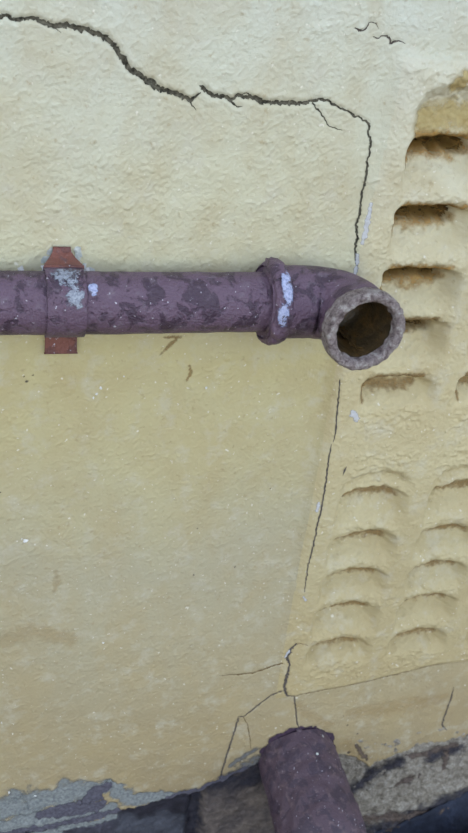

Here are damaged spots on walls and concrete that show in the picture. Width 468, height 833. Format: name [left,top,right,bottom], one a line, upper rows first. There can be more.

crack [355,22,406,44]
crack [0,13,372,275]
crack [304,379,347,592]
crack [219,643,439,779]
crack [441,688,454,730]
peeling [0,767,248,833]